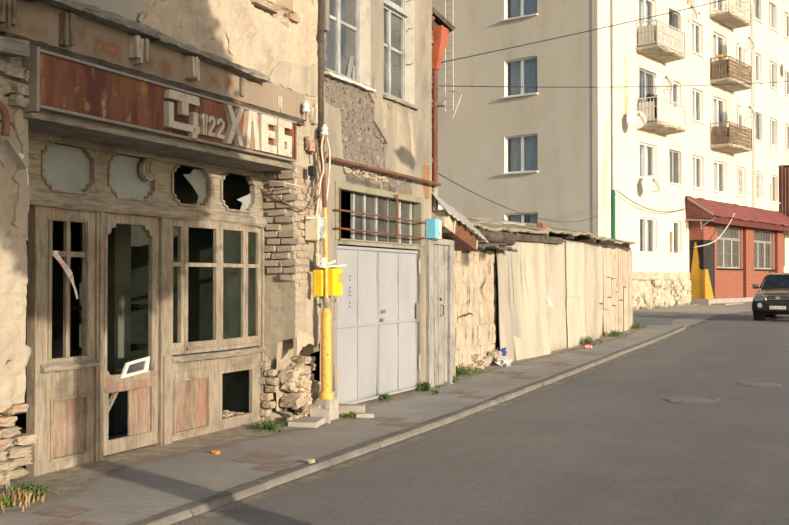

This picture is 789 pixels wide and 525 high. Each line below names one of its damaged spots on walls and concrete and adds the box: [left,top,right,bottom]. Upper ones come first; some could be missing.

spalling [250,0,301,23]
flaking render [269,61,392,182]
spalling [252,165,318,294]
spalling [259,330,321,421]
spalling [0,403,37,495]